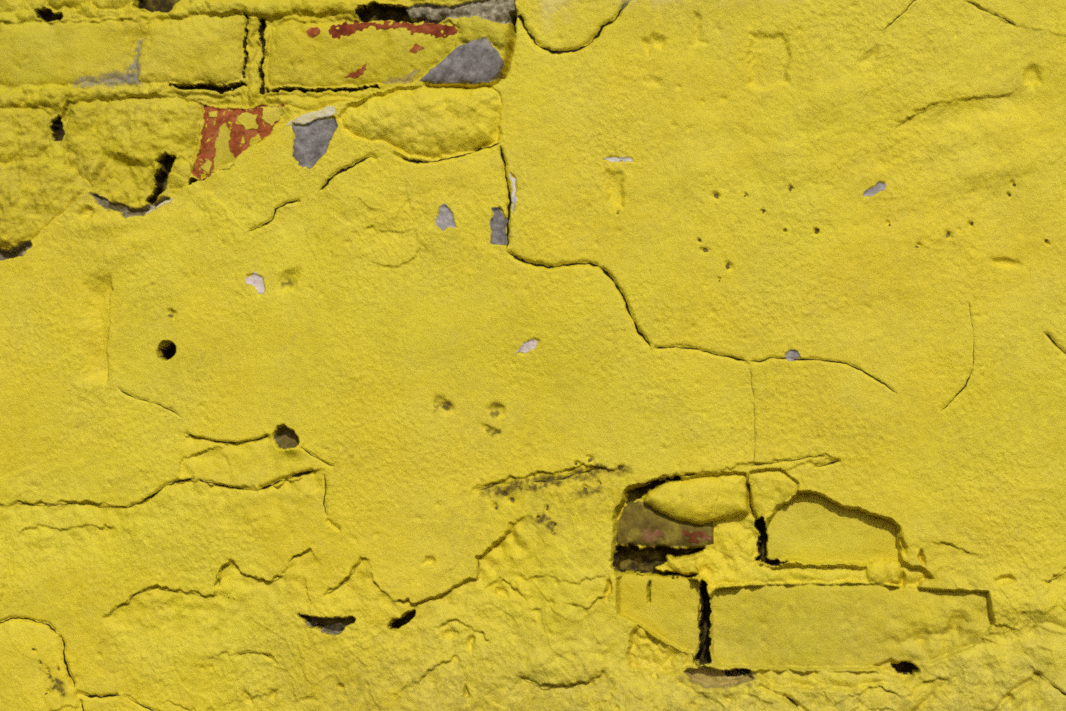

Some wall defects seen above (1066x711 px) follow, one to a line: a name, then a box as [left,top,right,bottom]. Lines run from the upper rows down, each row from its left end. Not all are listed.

crack [518,0,630,54]
spalling [0,0,517,260]
crack [250,143,897,518]
spalling [0,500,146,540]
crack [130,447,342,532]
spalling [107,458,995,689]
crack [0,617,153,711]